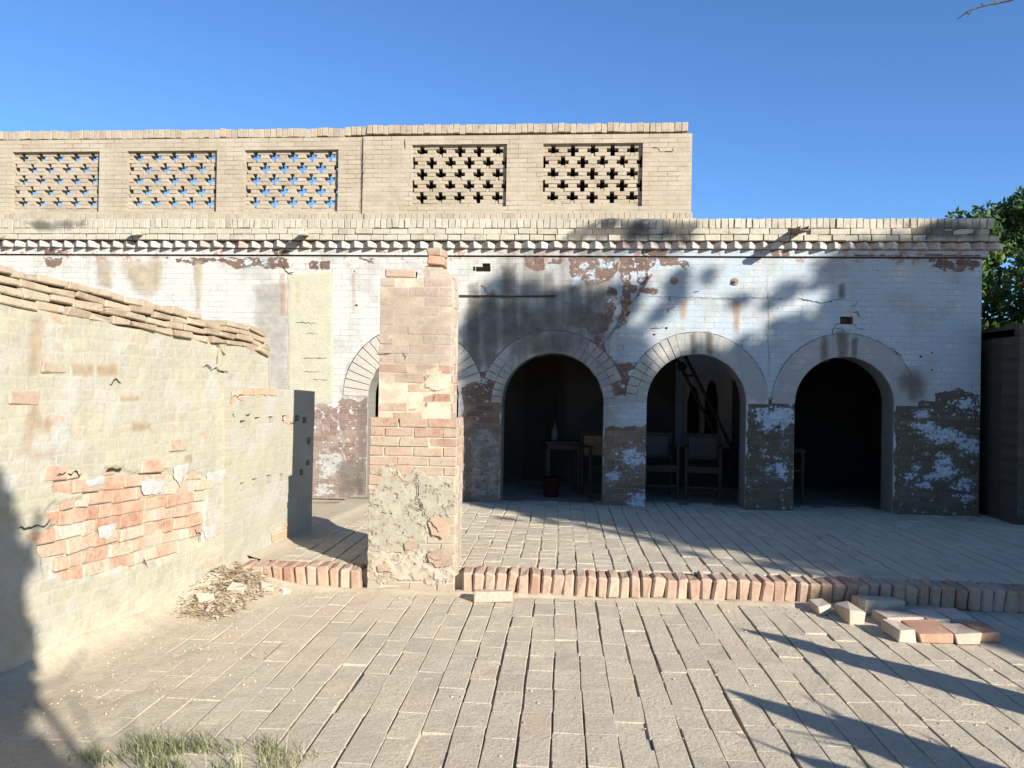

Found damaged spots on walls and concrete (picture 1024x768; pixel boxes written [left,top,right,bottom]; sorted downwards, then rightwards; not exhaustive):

crack [202,343,251,416]
peeling [166,249,290,269]
peeling [525,250,690,396]
crack [797,297,859,334]
peeling [924,254,980,282]
flaking render [25,439,226,581]
flaking render [312,371,502,586]
peeling [602,425,646,507]
peeling [745,397,796,511]
peeling [893,386,980,516]